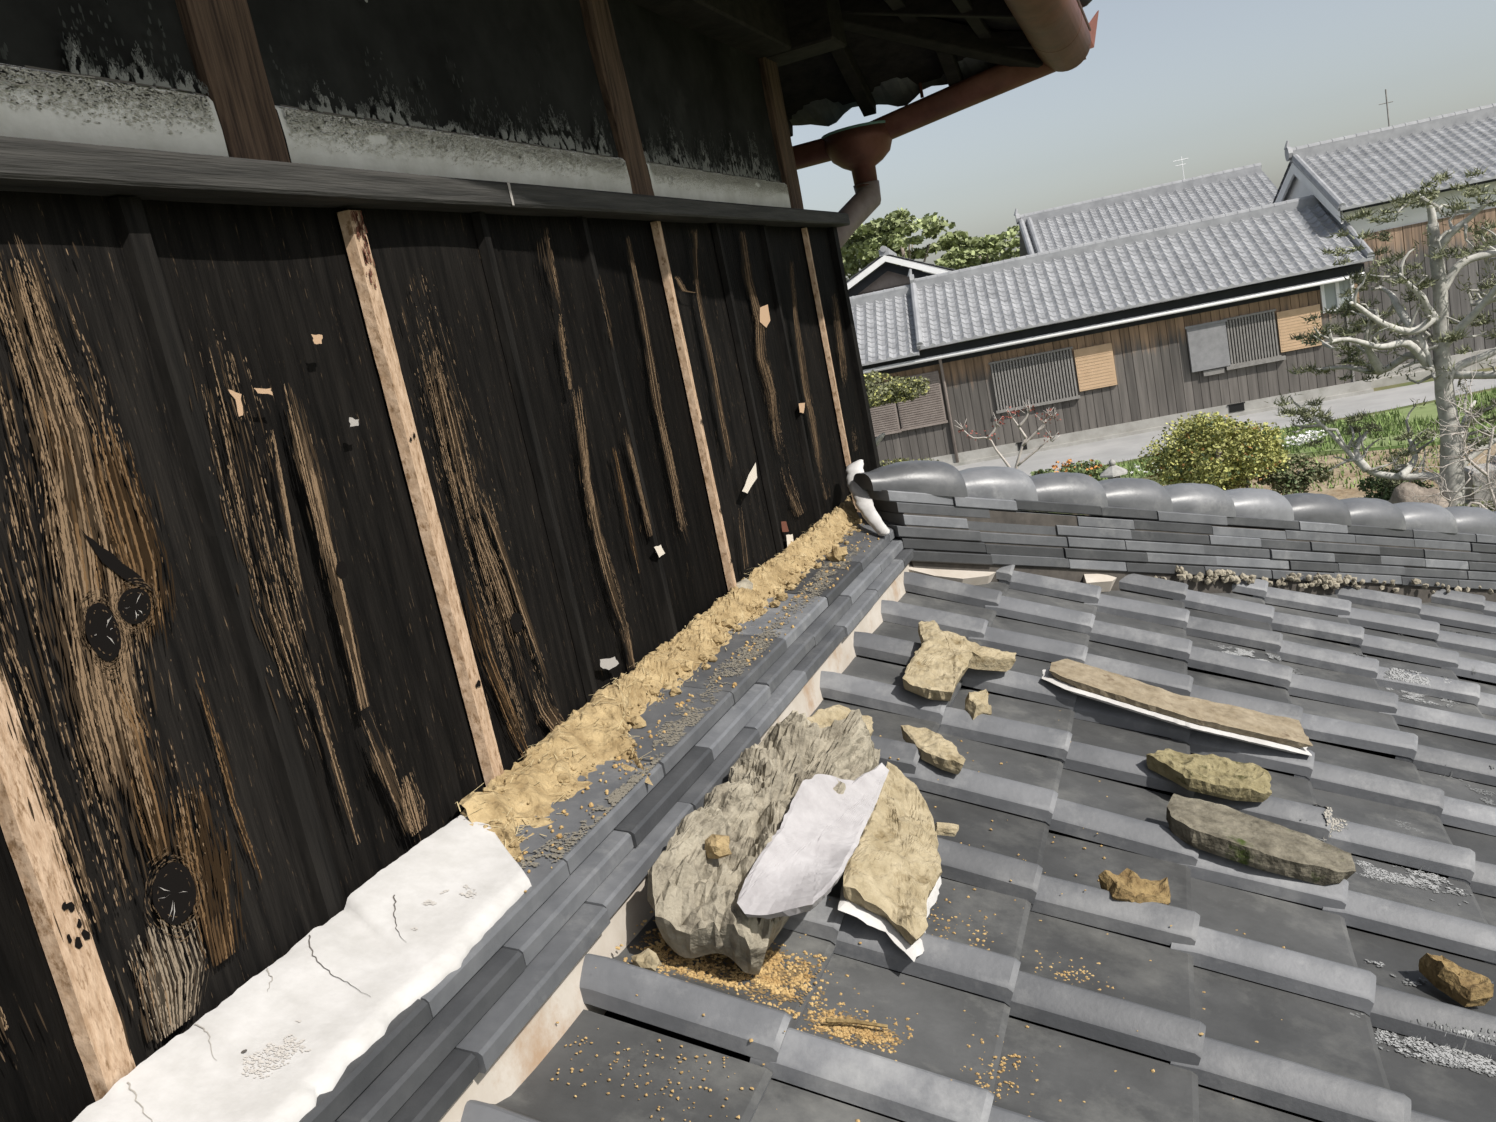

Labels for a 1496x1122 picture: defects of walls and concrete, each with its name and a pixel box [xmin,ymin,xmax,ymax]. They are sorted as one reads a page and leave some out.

damp [0,0,217,134]
damp [269,44,629,184]
damp [645,113,788,199]
peeling [228,388,273,417]
peeling [600,657,619,670]